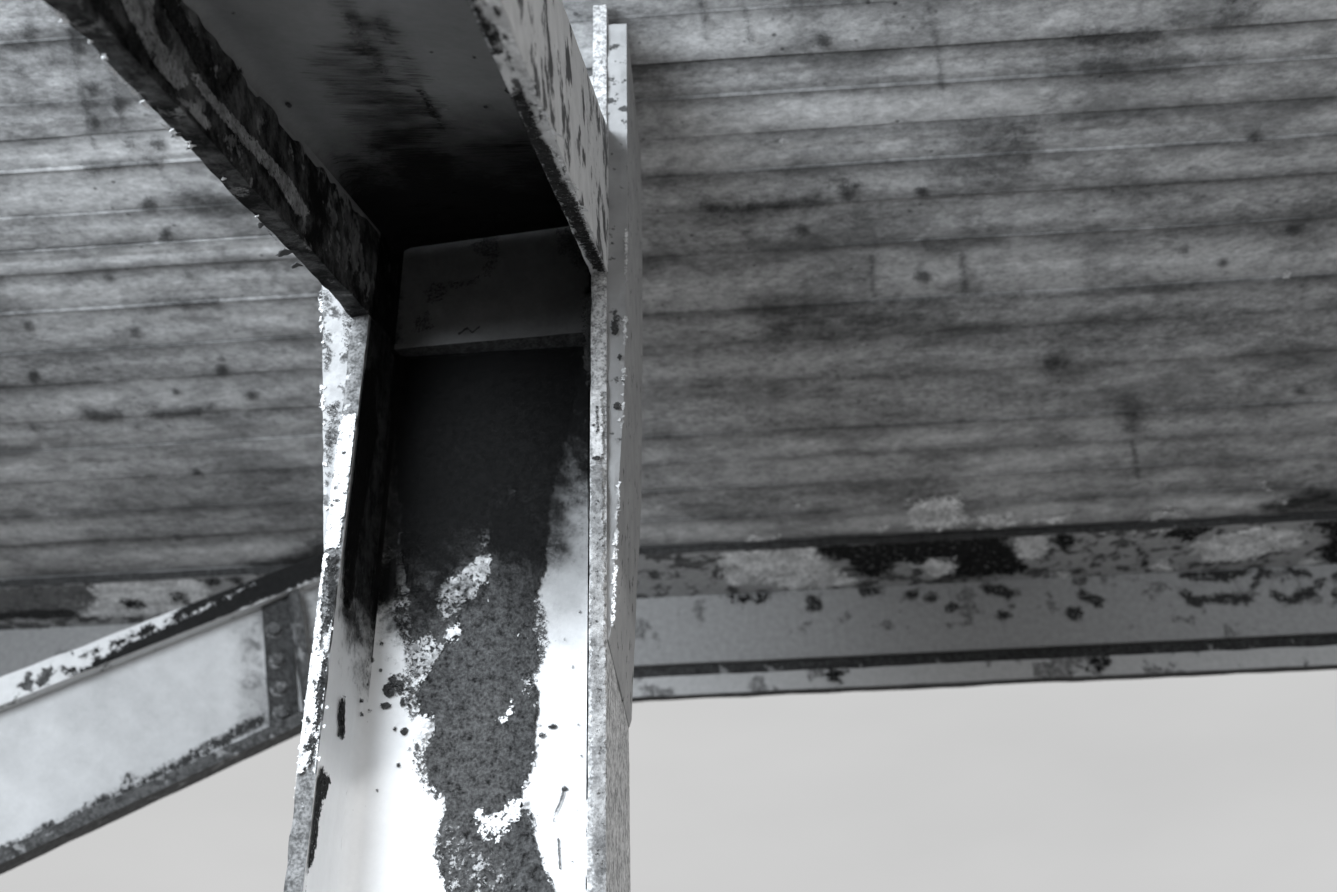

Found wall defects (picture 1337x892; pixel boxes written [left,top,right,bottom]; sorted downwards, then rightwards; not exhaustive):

peeling [1146,524,1329,573]
peeling [64,566,302,676]